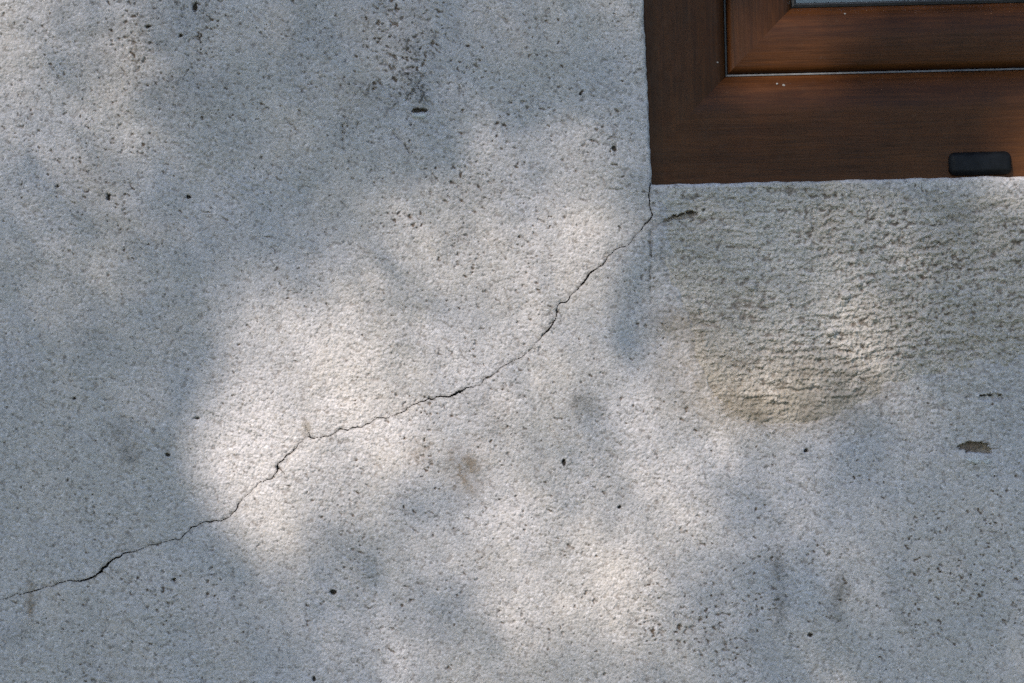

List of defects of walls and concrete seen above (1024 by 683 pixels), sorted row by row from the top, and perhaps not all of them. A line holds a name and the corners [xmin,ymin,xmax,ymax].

crack [0,184,653,600]